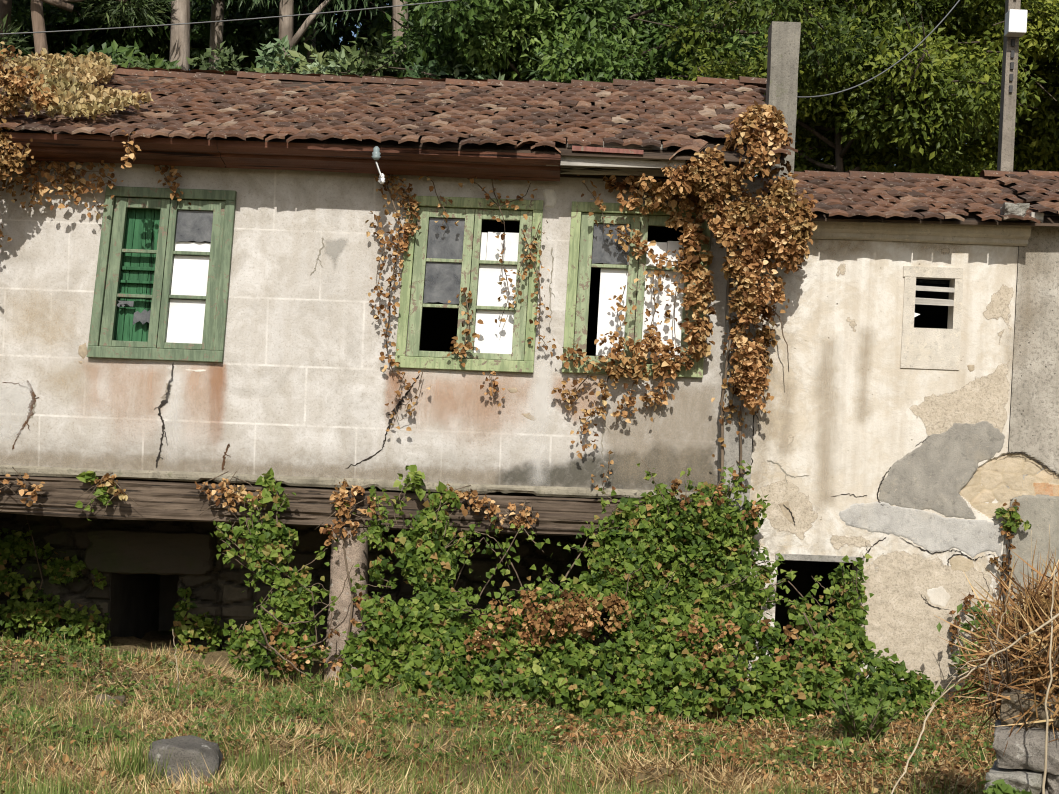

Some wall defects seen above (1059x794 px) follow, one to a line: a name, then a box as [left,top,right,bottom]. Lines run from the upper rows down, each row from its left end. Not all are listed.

crack [3,380,39,449]
crack [156,362,174,468]
peeling [909,362,1009,446]
peeling [760,480,822,540]
flaking render [959,452,1059,523]
peeling [830,535,996,682]